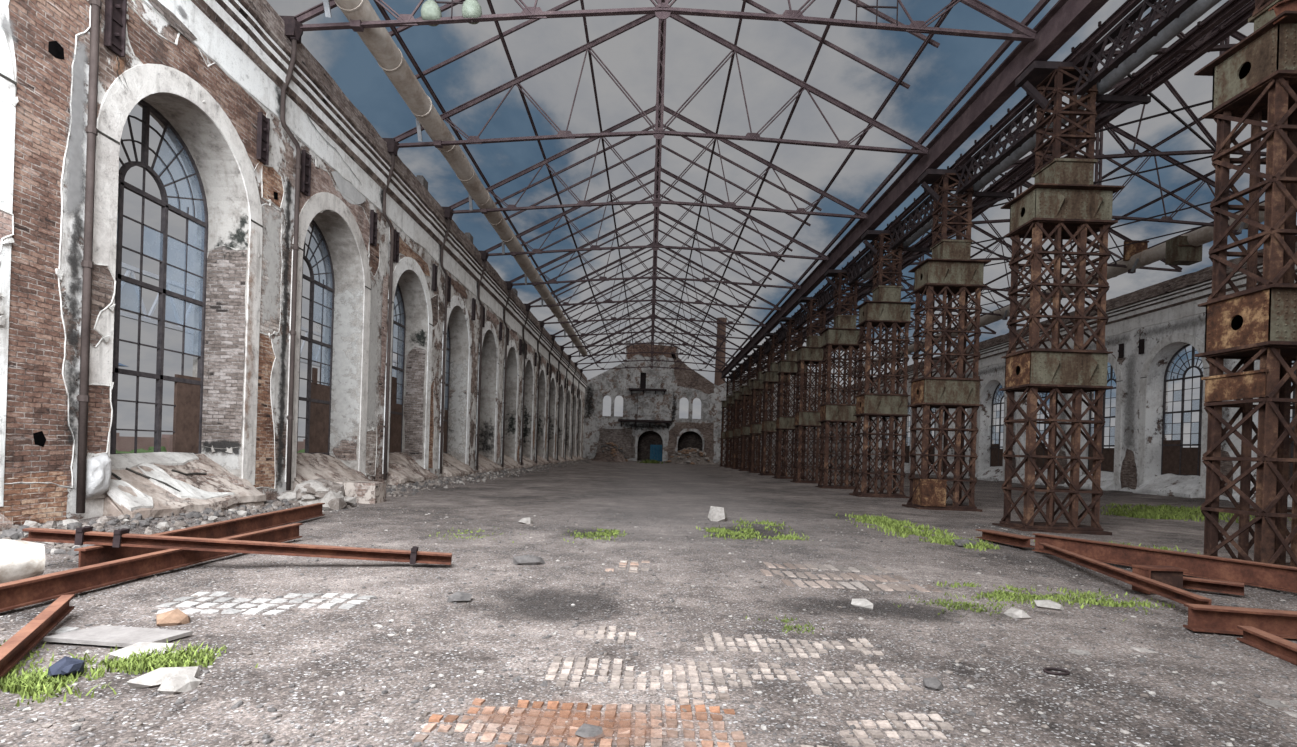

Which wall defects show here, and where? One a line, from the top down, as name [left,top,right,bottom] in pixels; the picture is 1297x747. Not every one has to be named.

flaking render [0,0,116,524]
damp [65,42,87,444]
flaking render [126,0,284,490]
flaking render [331,427,377,477]
flaking render [299,160,431,382]